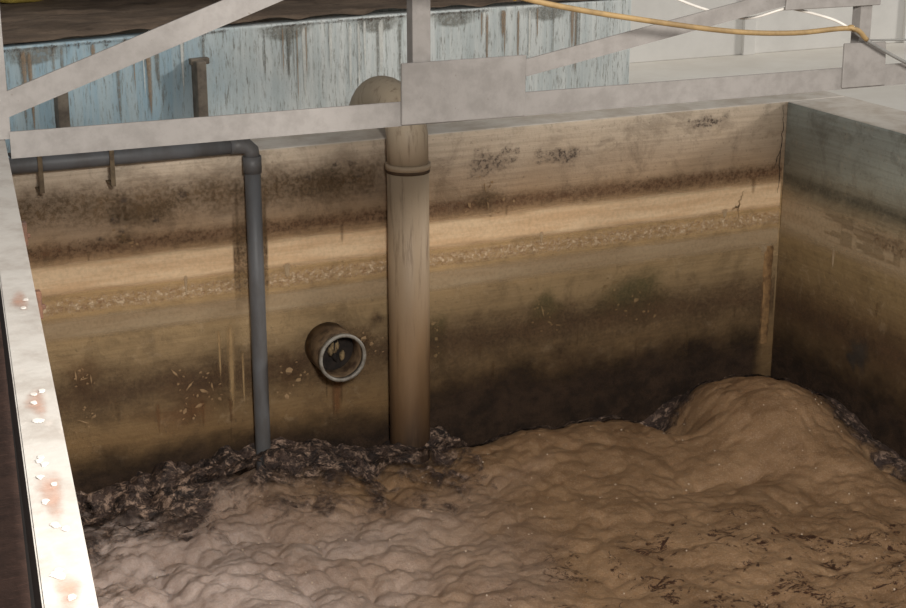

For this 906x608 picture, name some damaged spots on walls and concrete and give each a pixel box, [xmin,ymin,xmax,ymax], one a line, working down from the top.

water stain [264,23,307,96]
water stain [319,15,403,85]
water stain [18,180,250,340]
water stain [263,211,388,310]
water stain [429,165,906,289]
rust [30,389,45,423]
water stain [55,328,253,413]
water stain [268,353,323,381]
water stain [430,285,906,459]